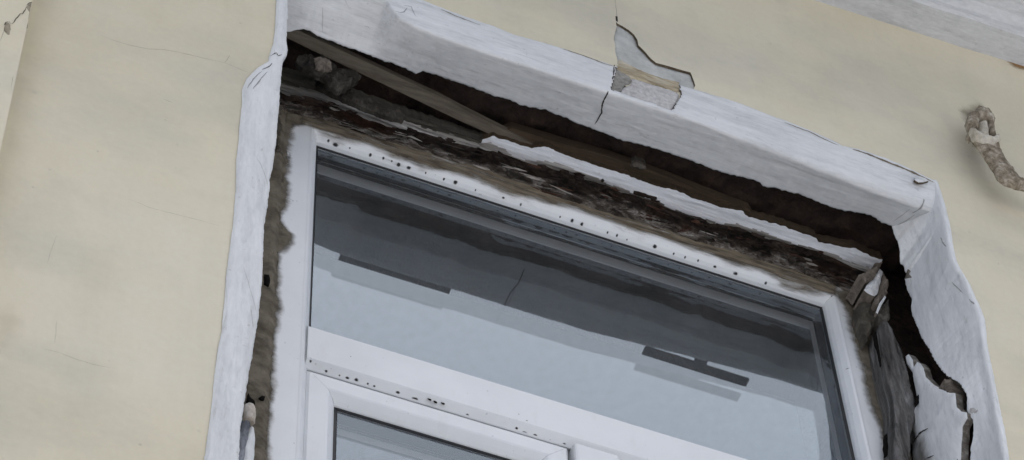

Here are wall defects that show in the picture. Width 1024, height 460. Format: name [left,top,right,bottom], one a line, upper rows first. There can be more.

crack [595,65,615,124]
flaking render [565,25,694,110]
leakage [242,109,884,460]
flaking render [845,262,890,351]